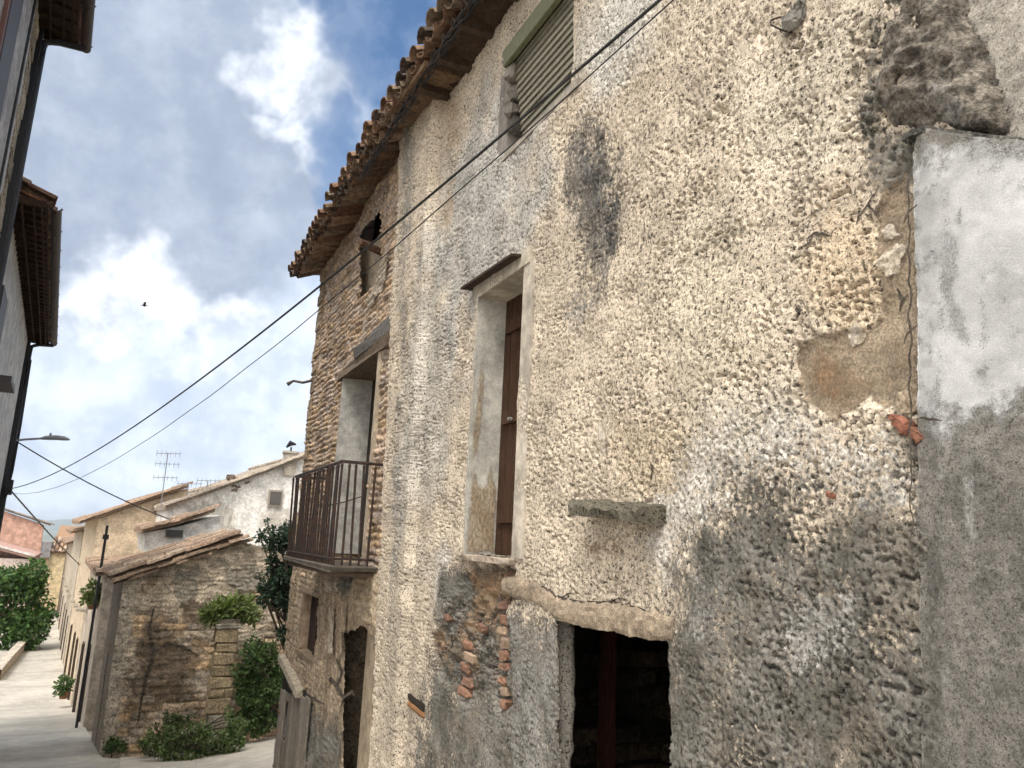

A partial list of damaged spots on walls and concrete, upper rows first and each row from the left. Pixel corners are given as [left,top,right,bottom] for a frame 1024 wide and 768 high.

damp [564,117,622,326]
flaking render [797,172,941,460]
peeling [938,209,965,335]
flaking render [434,565,516,711]
crack [529,580,647,611]